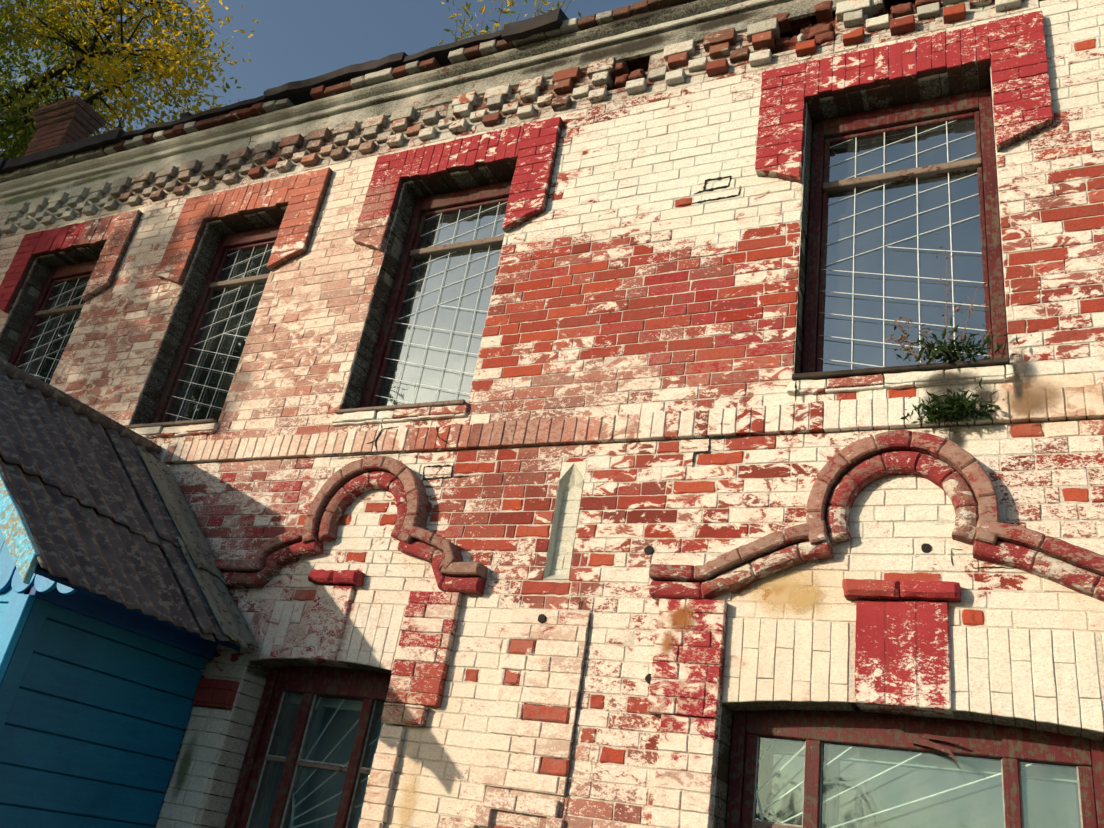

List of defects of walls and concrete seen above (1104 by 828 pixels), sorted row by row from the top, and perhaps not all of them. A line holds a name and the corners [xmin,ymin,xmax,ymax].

peeling [471,260,635,392]
peeling [617,295,746,362]
damp [1013,353,1054,412]
rust [663,608,693,651]